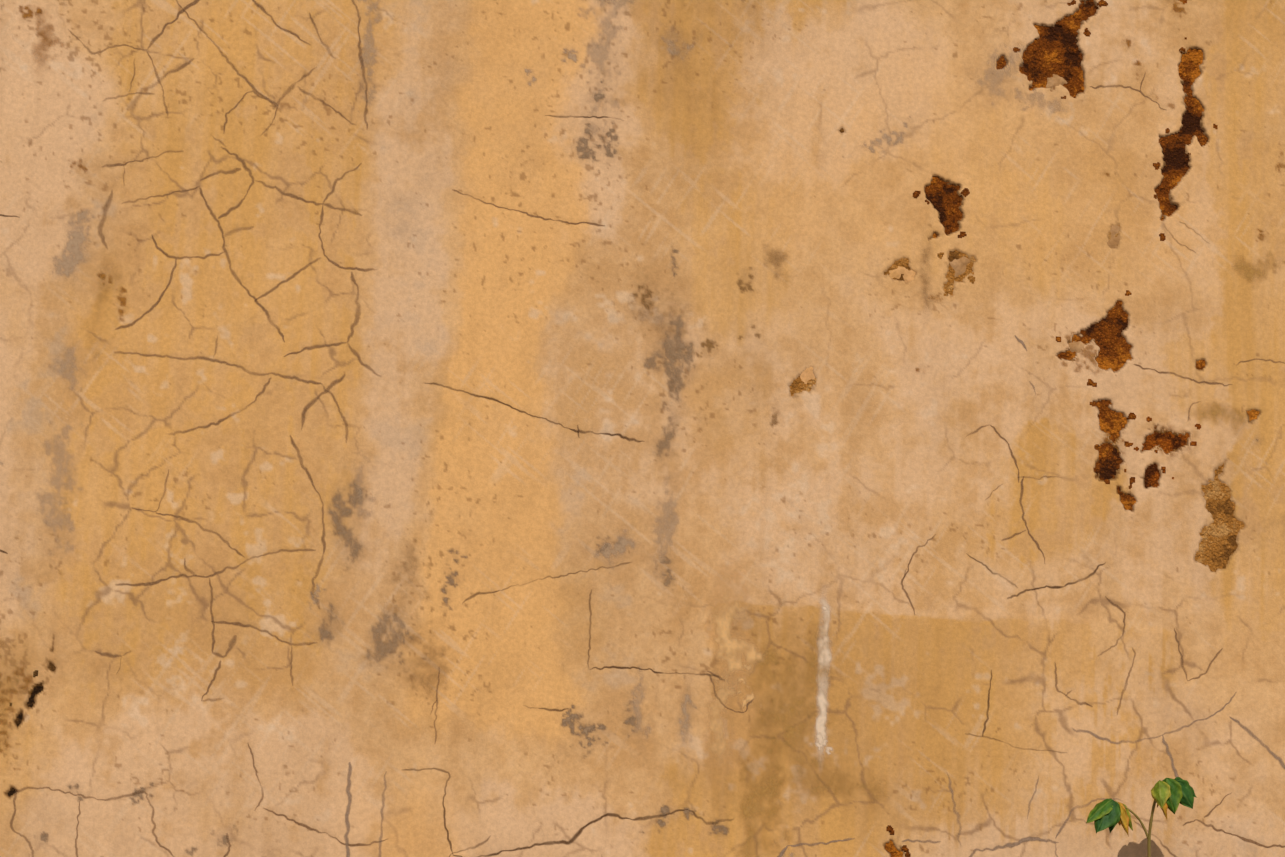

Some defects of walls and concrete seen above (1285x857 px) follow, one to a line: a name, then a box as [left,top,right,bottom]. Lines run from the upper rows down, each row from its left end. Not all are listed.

spalling [996,0,1108,99]
spalling [1153,37,1218,241]
crack [117,74,369,490]
spalling [913,176,976,296]
spalling [1056,290,1201,511]
crack [980,426,1126,627]
peeling [1195,463,1245,572]
crack [119,550,285,698]
damp [709,576,832,756]
crack [256,763,384,857]
crack [443,798,694,857]
crack [1164,794,1285,857]